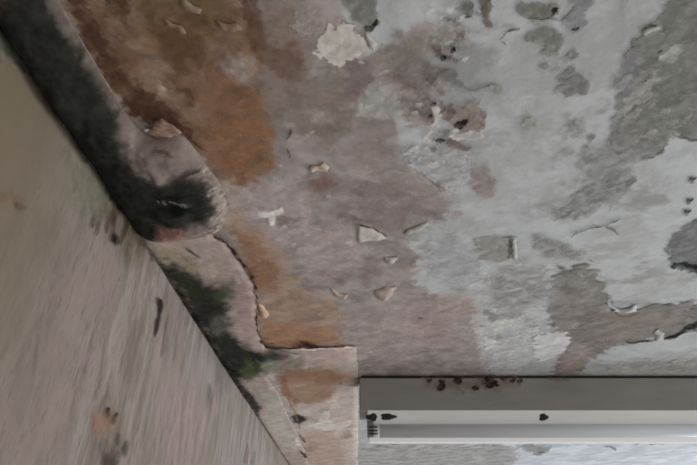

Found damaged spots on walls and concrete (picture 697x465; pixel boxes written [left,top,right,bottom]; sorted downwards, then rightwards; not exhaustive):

flaking render [113,0,203,48]
leakage [0,0,347,413]
flaking render [143,0,697,465]
crack [214,236,273,345]
crack [292,341,319,349]
rust [426,376,462,391]
rust [472,376,522,391]